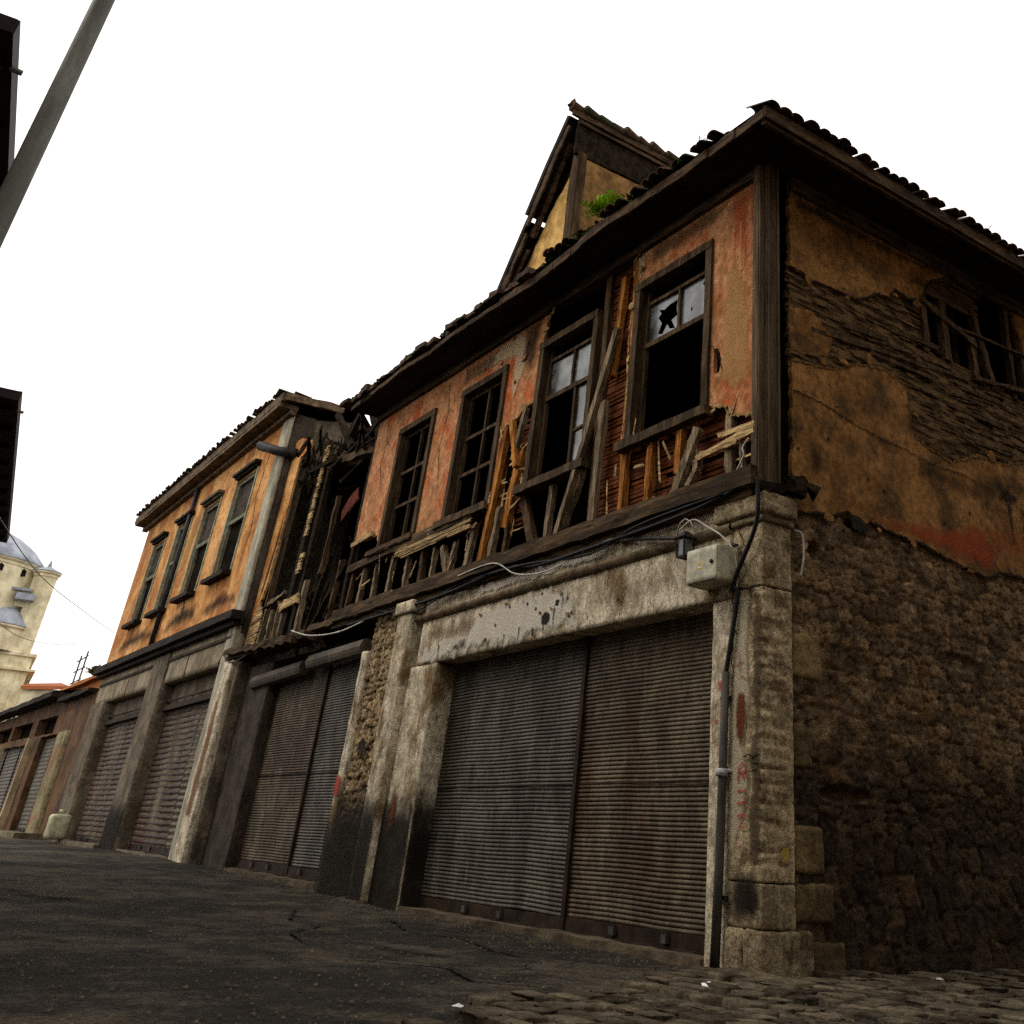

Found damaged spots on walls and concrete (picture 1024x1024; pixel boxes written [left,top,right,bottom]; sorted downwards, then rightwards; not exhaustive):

spalling [339,263,546,410]
peeling [483,334,533,432]
flaking render [710,403,752,418]
flaking render [797,508,1024,579]